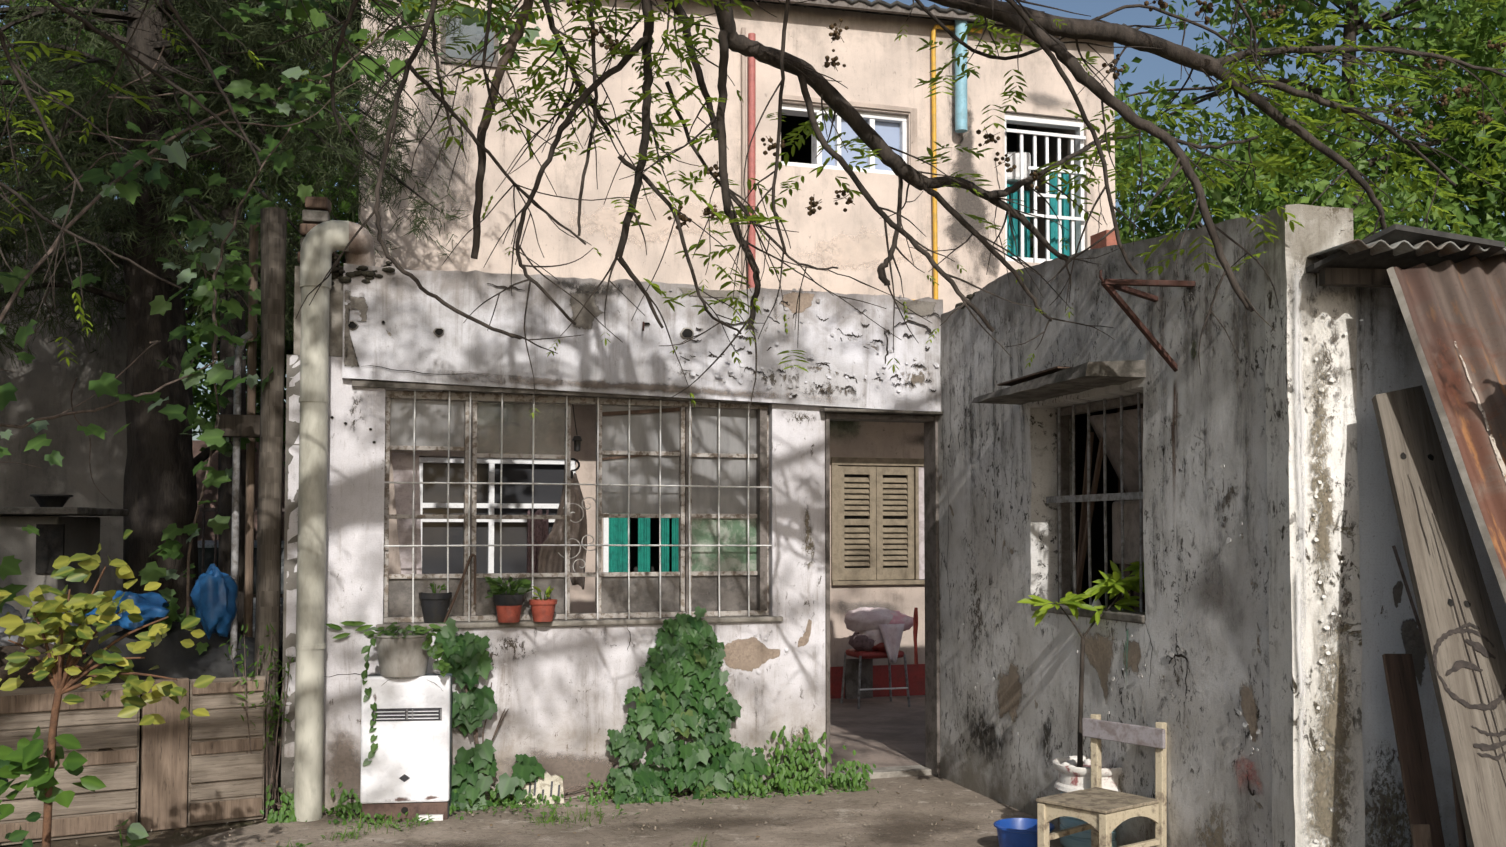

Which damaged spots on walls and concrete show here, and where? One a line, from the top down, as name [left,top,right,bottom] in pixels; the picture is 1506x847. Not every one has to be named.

spalling [344,290,368,367]
spalling [764,288,820,332]
spalling [895,295,936,318]
peeling [723,360,856,424]
peeling [848,334,939,392]
damp [1294,279,1306,766]
peeling [723,613,813,676]
peeling [962,559,1023,736]
peeling [1073,621,1146,714]
damp [963,708,1004,761]
peeling [1237,684,1261,754]